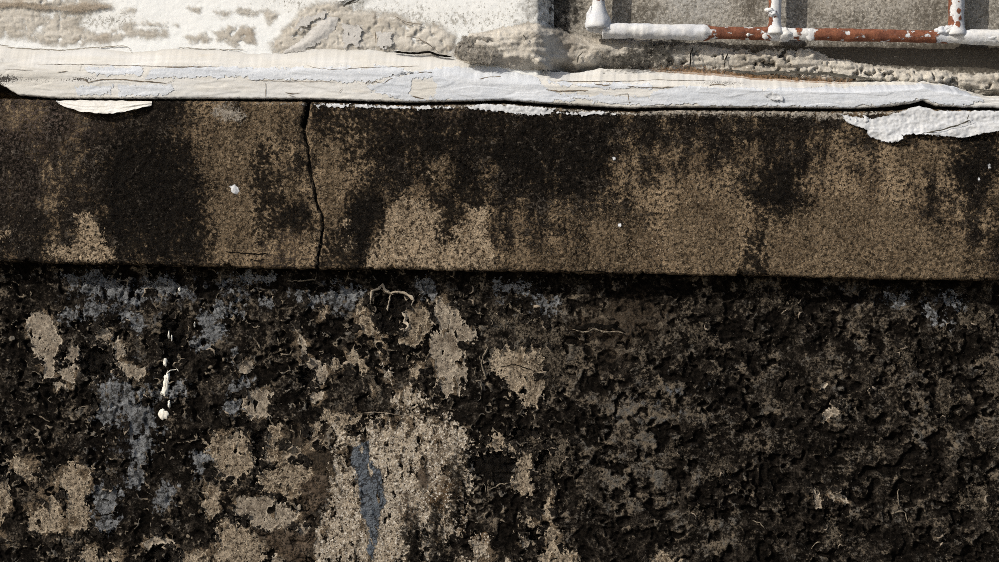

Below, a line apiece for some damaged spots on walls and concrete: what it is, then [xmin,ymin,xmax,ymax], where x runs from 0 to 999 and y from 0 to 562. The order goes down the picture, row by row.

rust [703,0,773,41]
rust [814,28,949,44]
leakage [90,126,218,267]
leakage [245,102,617,270]
crack [0,16,999,272]
peeling [56,64,999,143]
leakage [736,154,816,276]
leakage [942,133,999,279]
leakage [377,357,439,412]
leakage [249,524,315,562]
leakage [292,473,330,515]
leakage [390,443,494,562]